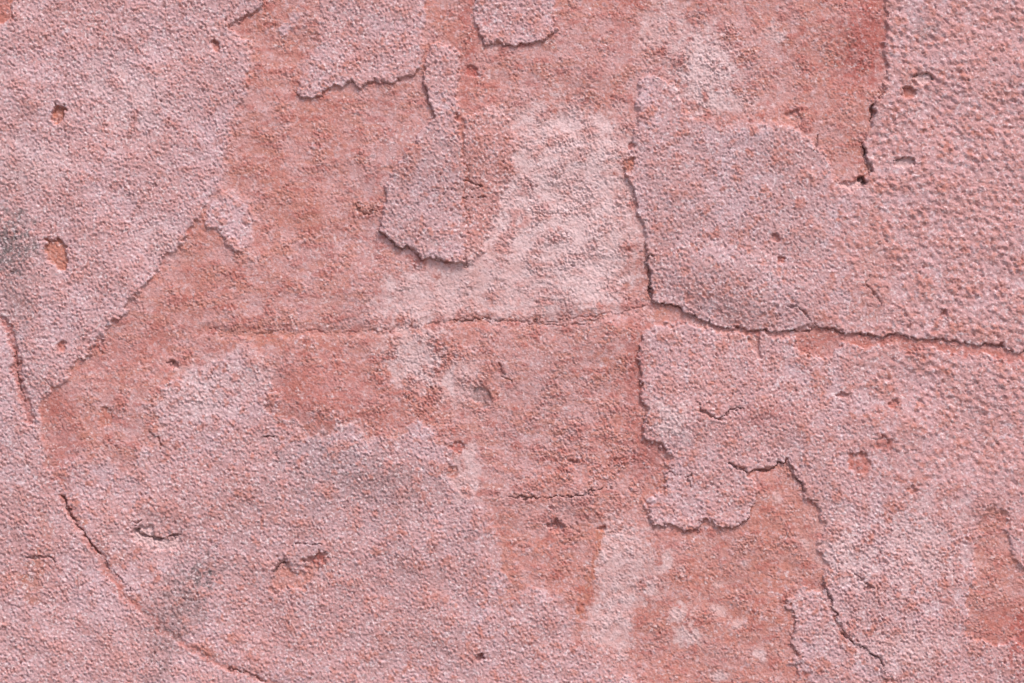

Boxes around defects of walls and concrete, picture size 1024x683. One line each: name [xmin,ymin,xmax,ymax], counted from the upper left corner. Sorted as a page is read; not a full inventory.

crack [857,104,917,187]
crack [355,201,378,216]
peeling [41,0,936,468]
crack [270,327,324,335]
crack [350,254,1024,353]
peeling [446,148,905,683]
spalling [130,524,186,557]
crack [54,487,288,683]
spalling [268,543,329,601]
crack [822,580,855,644]